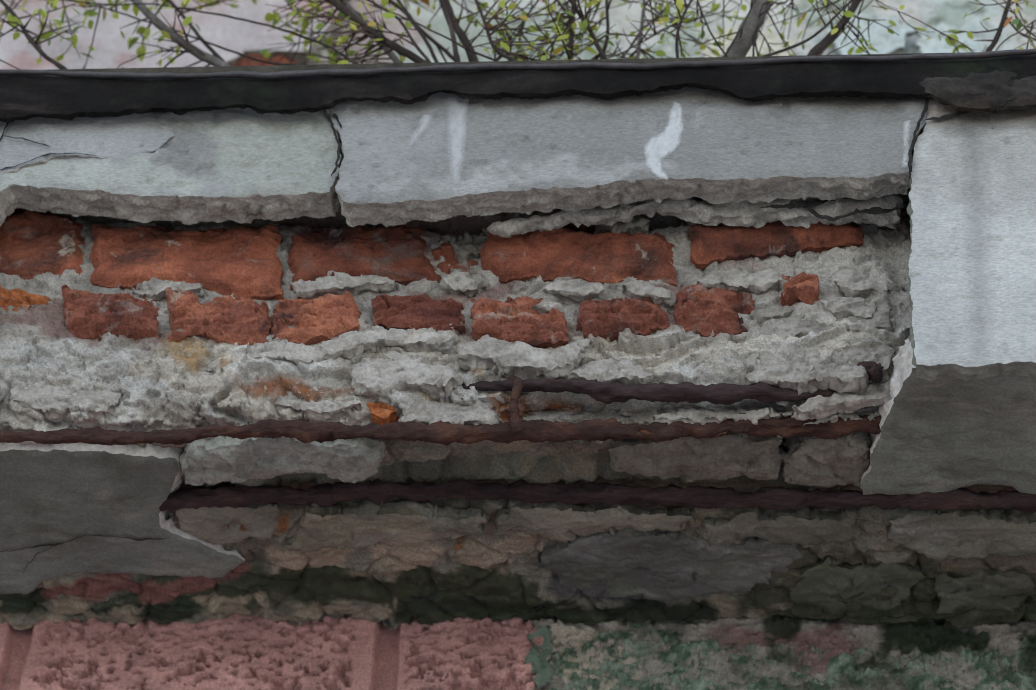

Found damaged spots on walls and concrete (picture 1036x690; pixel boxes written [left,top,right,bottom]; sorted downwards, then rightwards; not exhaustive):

crack [324,113,342,176]
efflorescence [645,104,682,178]
crack [908,99,970,178]
crack [760,197,898,221]
rust [243,378,324,402]
rust [492,395,577,423]
spalling [0,194,1036,690]